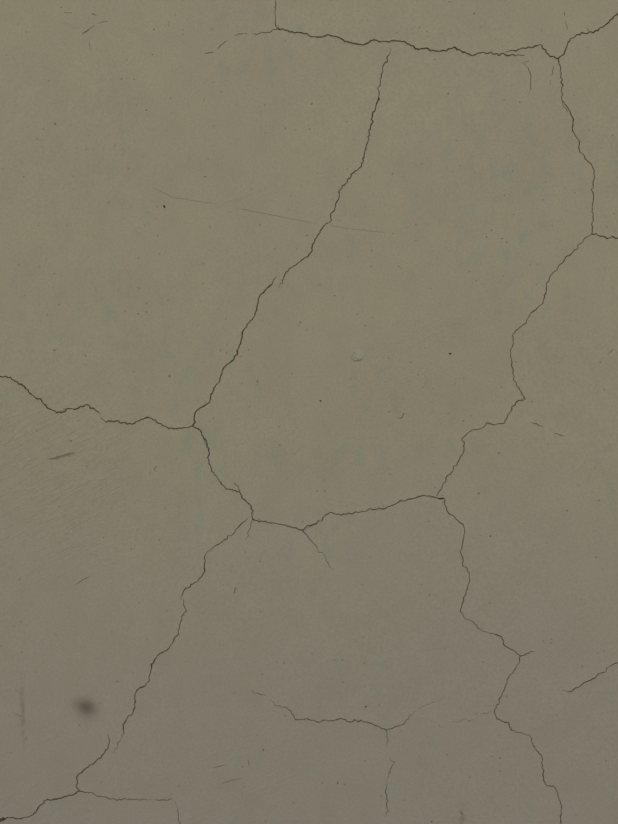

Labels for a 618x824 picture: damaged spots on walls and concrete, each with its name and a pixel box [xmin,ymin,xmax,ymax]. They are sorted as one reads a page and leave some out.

crack [0,278,319,549]
crack [251,12,618,824]
crack [115,519,247,749]
crack [0,738,151,822]